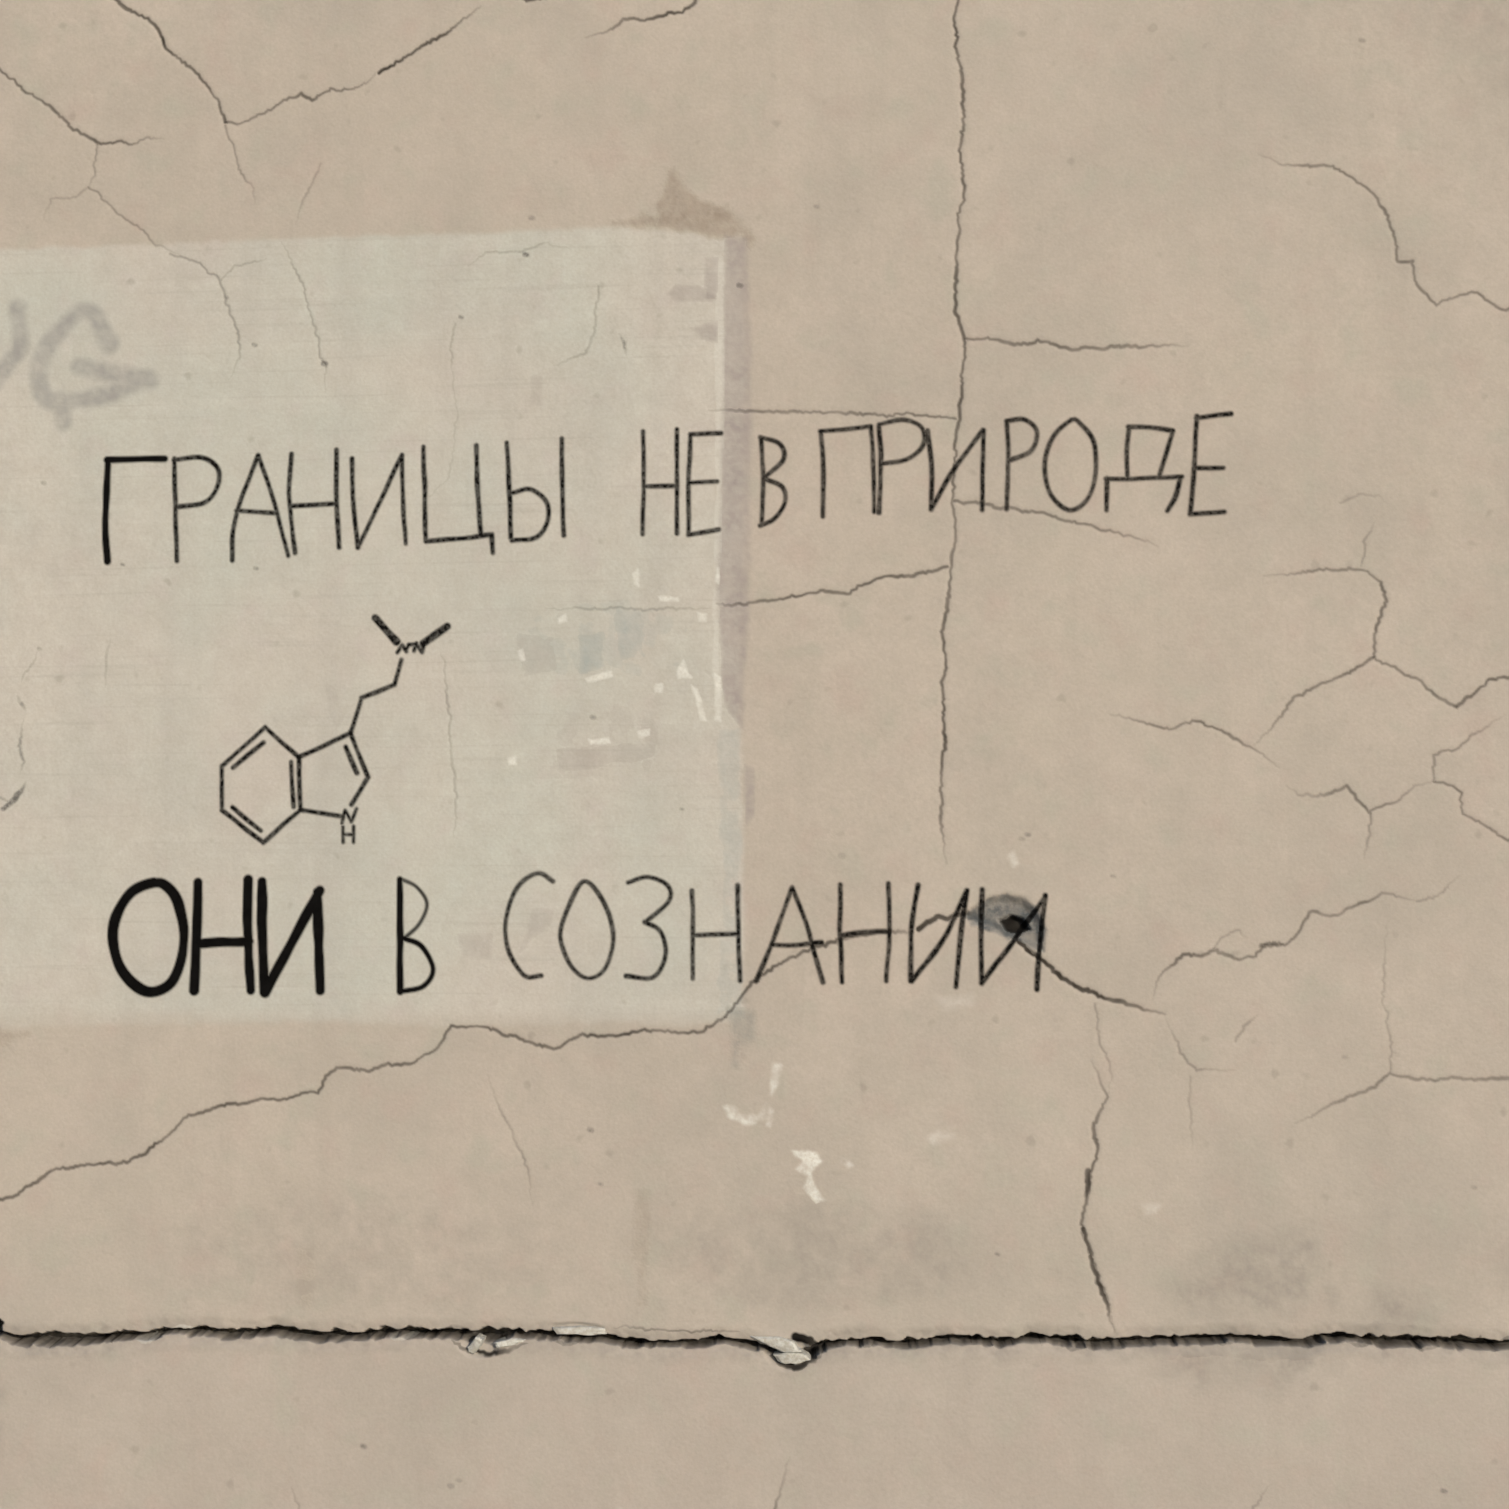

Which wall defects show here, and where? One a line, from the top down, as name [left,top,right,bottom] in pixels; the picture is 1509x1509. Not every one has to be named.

crack [109,0,482,205]
crack [521,0,543,8]
crack [0,66,328,393]
crack [465,242,572,268]
crack [1257,153,1509,313]
crack [413,322,459,517]
crack [544,0,1189,865]
crack [0,492,1509,1381]